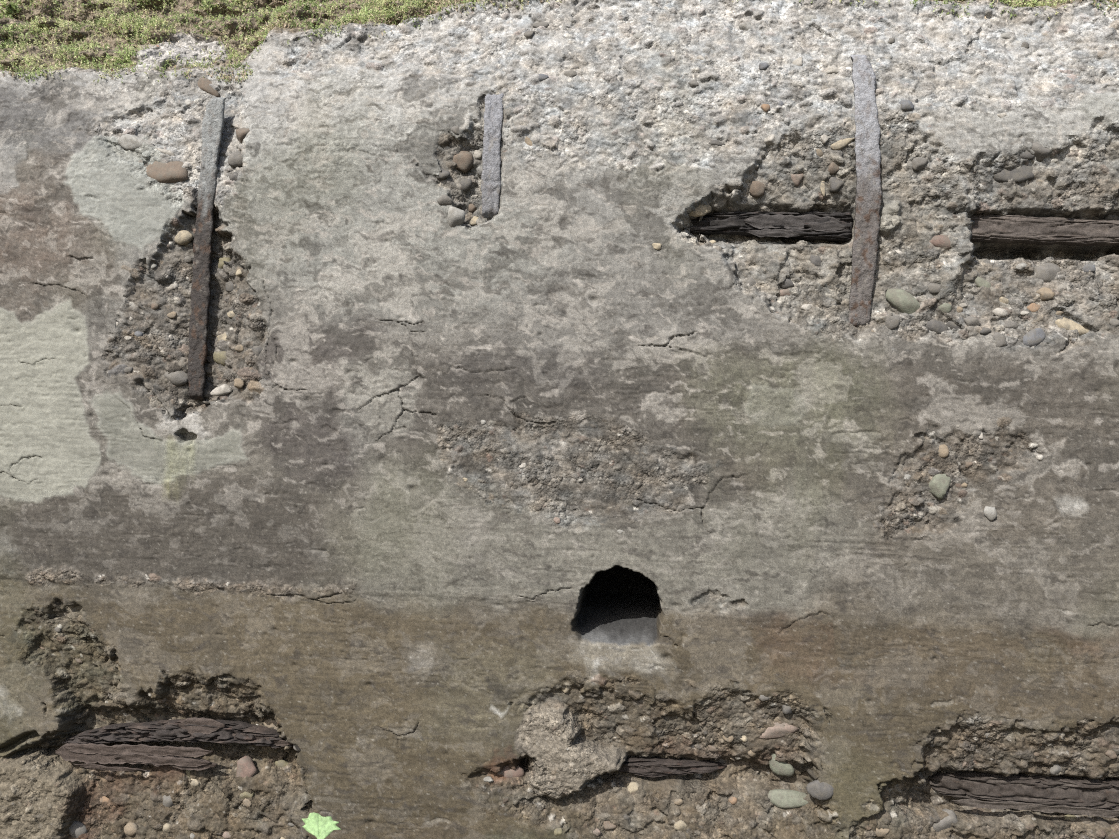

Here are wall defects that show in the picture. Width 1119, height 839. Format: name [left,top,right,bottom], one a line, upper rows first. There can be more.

spalling [0,74,275,505]
spalling [412,87,516,235]
spalling [665,110,1119,359]
crack [373,318,438,443]
crack [487,395,557,427]
spalling [5,596,89,670]
spalling [0,668,317,839]
spalling [461,670,1119,839]